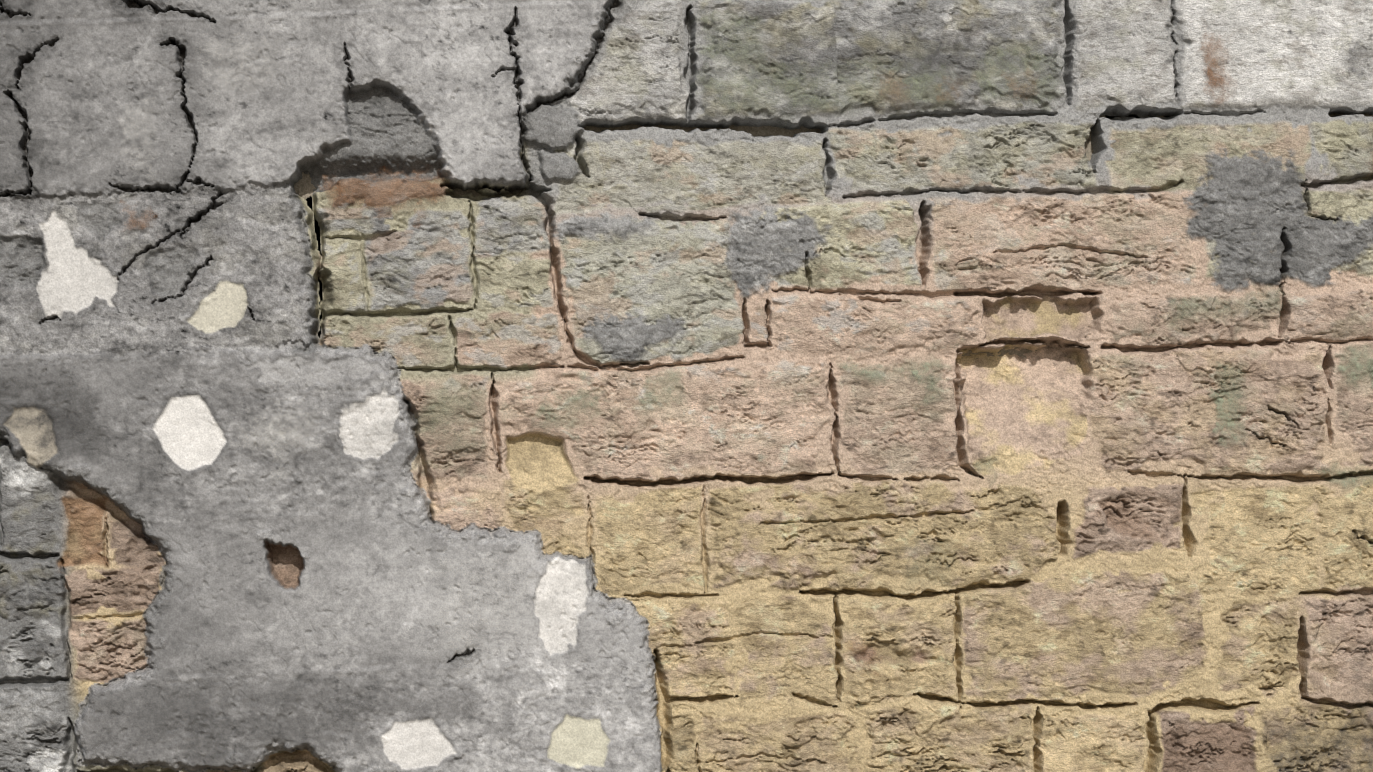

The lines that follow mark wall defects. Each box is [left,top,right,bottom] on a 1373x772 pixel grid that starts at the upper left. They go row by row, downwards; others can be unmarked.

crack [344,44,354,90]
spalling [515,0,614,149]
crack [110,0,224,281]
peeling [0,201,126,320]
crack [153,258,214,305]
peeling [146,244,249,337]
spalling [245,85,661,742]
spalling [955,295,1104,478]
spalling [0,391,345,772]
peeling [368,719,465,772]
peeling [540,715,610,771]
spalling [1162,721,1257,772]